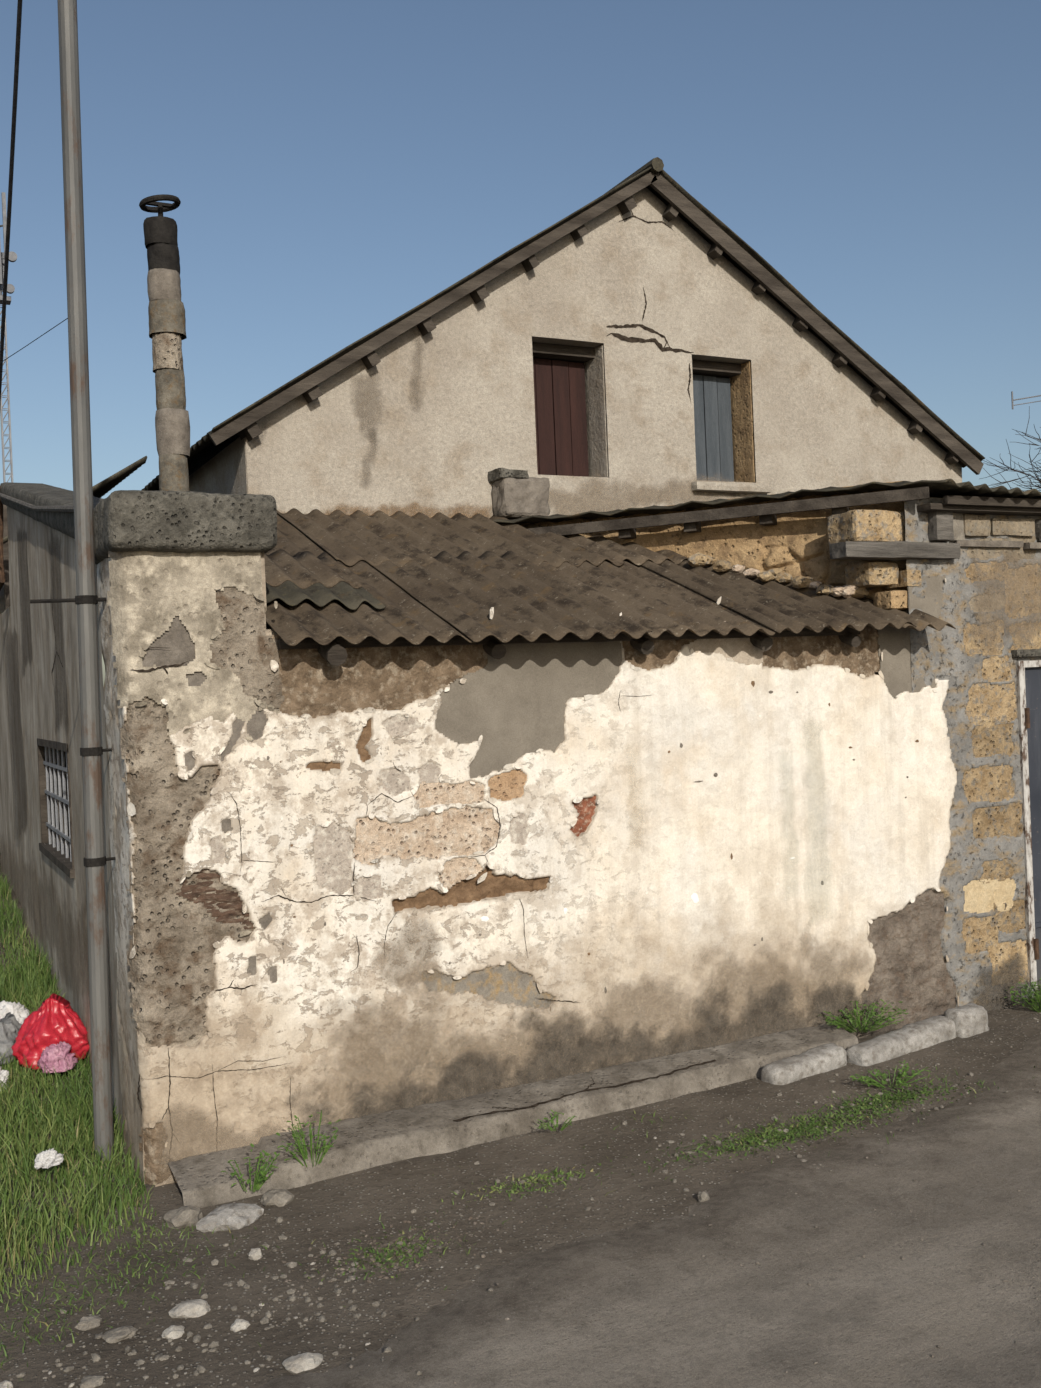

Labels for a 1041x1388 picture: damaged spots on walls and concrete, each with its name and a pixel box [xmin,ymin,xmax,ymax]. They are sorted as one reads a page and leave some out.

crack [606,288,694,401]
flaking render [622,625,884,694]
flaking render [107,550,556,1048]
flaking render [570,795,601,837]
flaking render [862,888,959,1033]
leakage [348,957,895,1118]